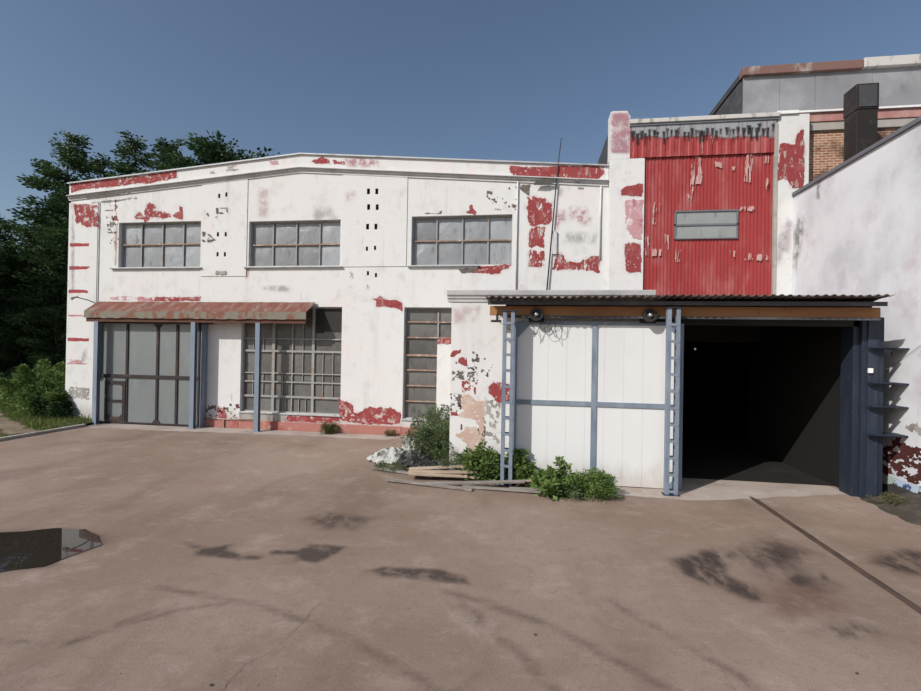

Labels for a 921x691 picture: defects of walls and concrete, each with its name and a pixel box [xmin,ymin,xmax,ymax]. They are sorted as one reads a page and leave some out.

peeling [778,130,805,188]
peeling [70,171,183,244]
peeling [486,165,604,273]
peeling [621,183,644,273]
peeling [373,296,403,311]
peeling [206,398,401,425]
flaking render [437,338,510,454]
peeling [882,423,921,493]